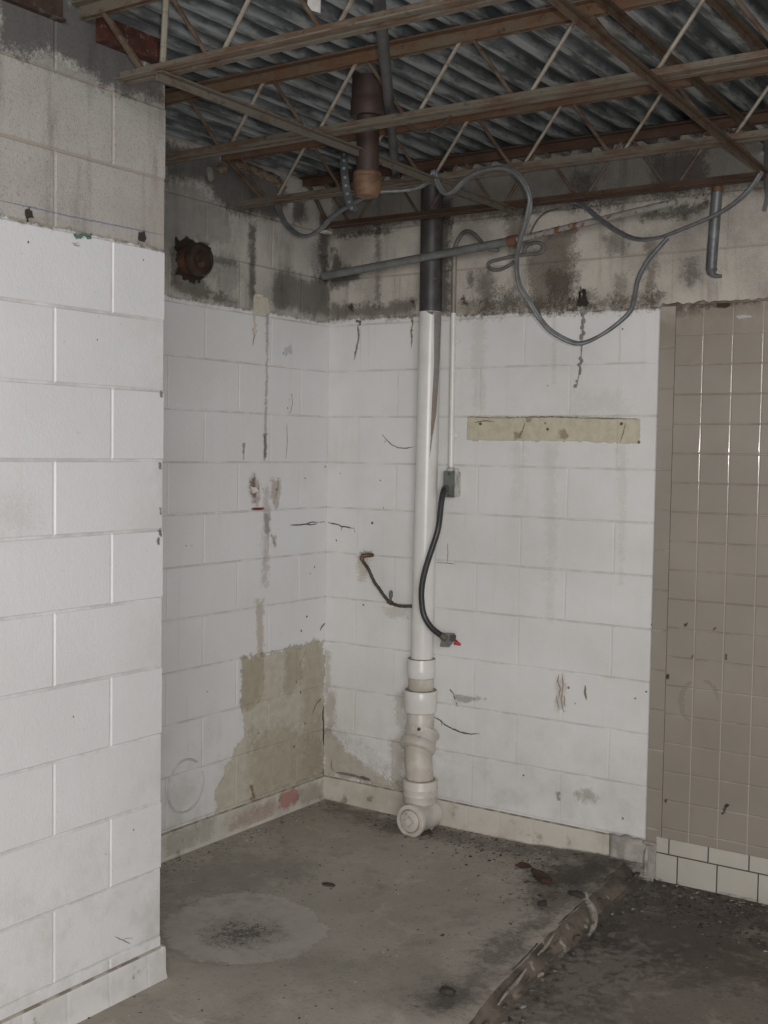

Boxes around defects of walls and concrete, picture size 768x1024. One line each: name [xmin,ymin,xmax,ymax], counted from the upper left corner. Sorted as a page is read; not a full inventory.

leakage [165,142,288,219]
leakage [330,247,358,289]